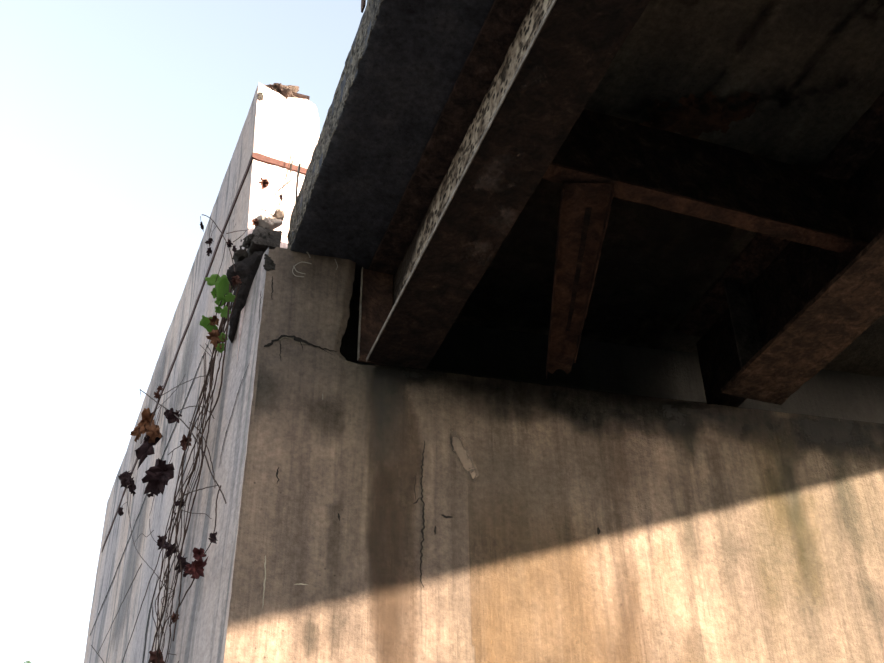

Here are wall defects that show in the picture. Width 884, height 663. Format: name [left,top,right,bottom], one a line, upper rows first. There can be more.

crack [264,335,337,359]
crack [219,367,248,466]
crack [413,441,427,587]